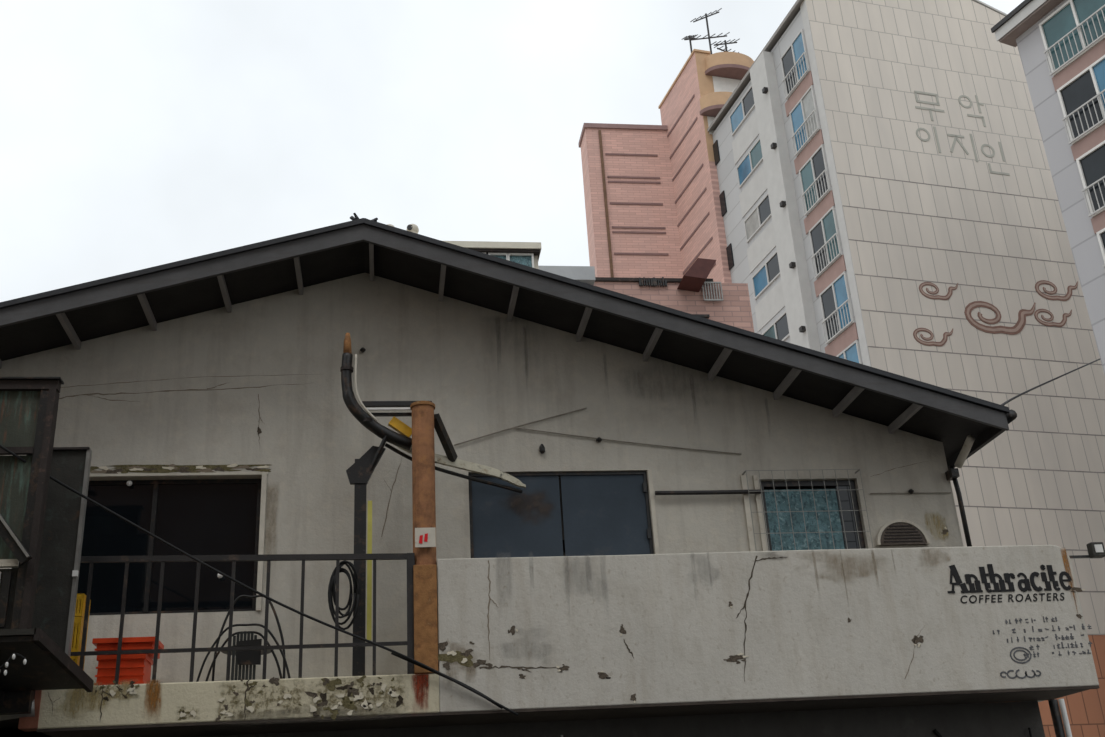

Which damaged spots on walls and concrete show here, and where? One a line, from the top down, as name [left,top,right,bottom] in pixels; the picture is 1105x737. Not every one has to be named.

crack [59,374,313,444]
crack [736,556,787,682]
peeling [438,641,493,670]
peeling [215,675,403,722]
corrosion [413,674,428,703]